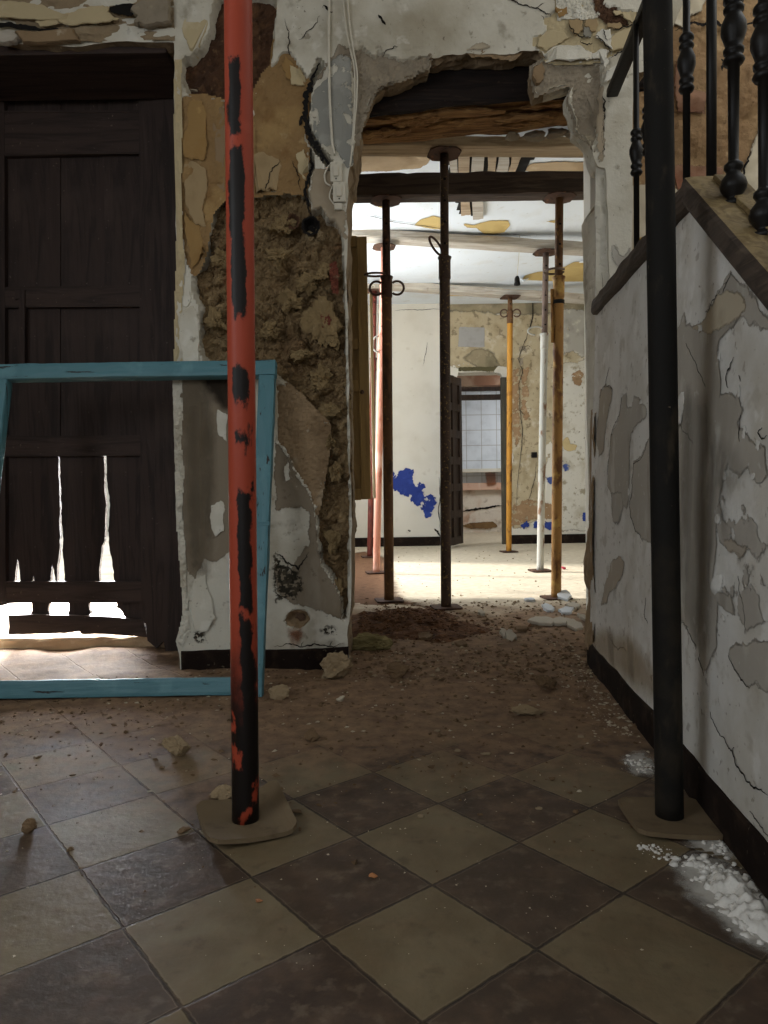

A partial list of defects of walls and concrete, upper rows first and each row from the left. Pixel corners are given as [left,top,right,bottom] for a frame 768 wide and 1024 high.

peeling [0,0,119,46]
flaking render [130,0,227,361]
flaking render [172,380,229,647]
spalling [252,3,433,634]
peeling [415,216,440,229]
peeling [464,220,510,234]
crack [438,316,537,521]
flaking render [467,0,637,162]
peeling [512,309,651,650]
flaking render [674,61,706,114]
peeling [677,271,768,693]
crack [710,712,768,836]